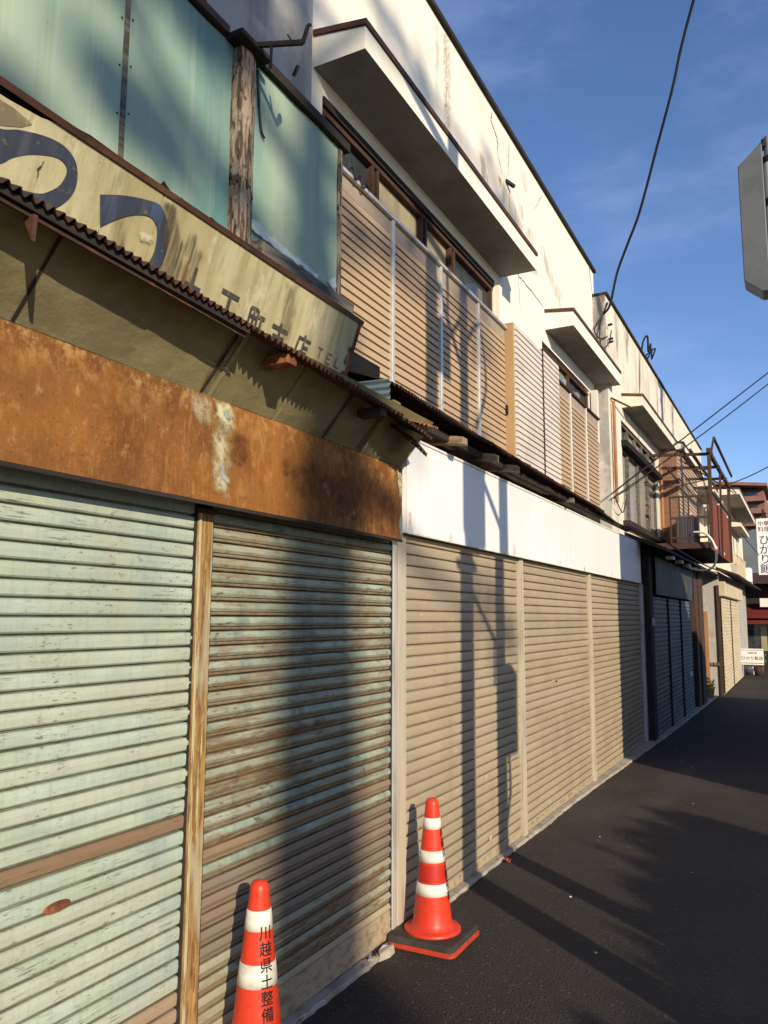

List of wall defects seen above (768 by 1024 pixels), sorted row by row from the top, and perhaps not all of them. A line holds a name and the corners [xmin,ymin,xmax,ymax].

peeling [212,402,236,491]